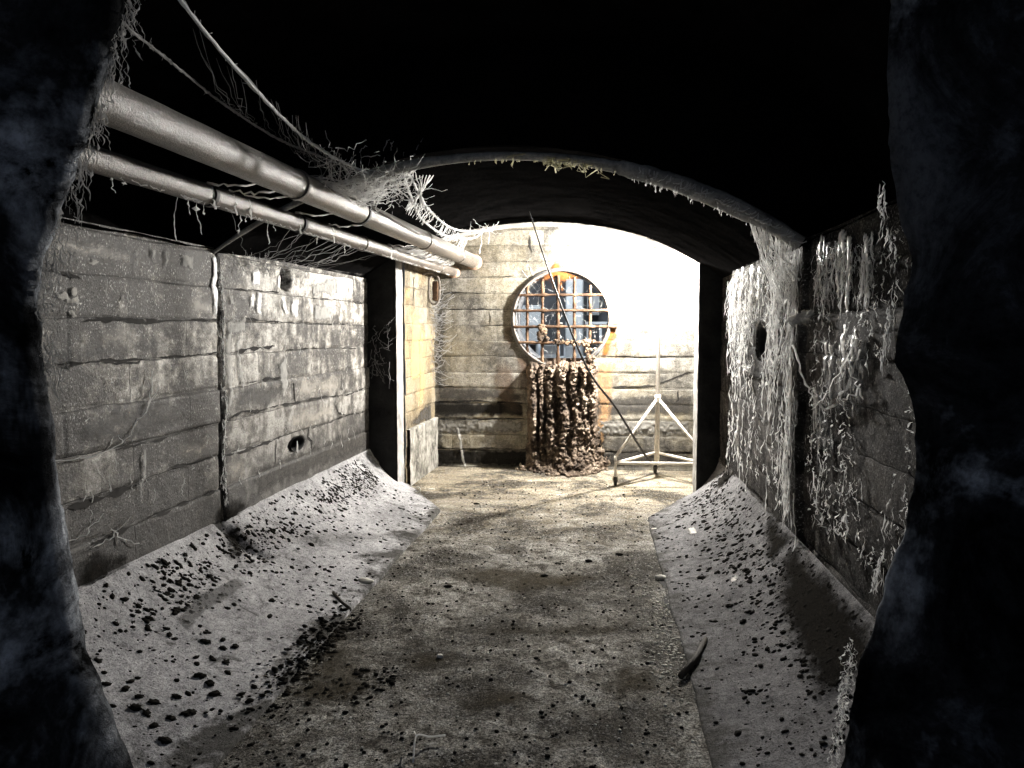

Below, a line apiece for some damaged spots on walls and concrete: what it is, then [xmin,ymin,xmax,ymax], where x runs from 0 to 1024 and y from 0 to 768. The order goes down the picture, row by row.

crack [42,259,366,545]
corrosion [546,262,576,285]